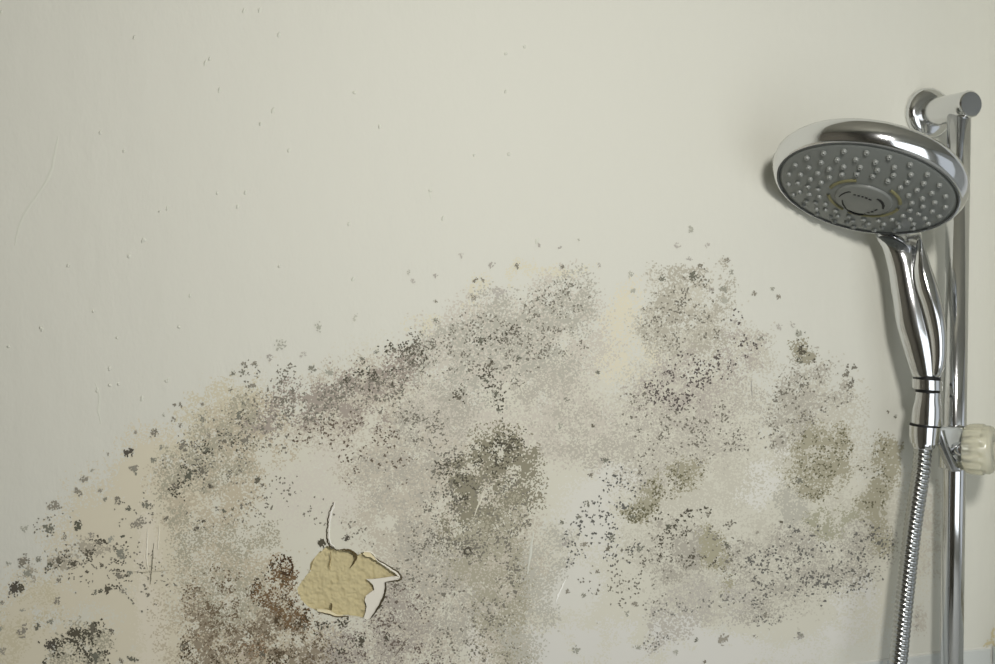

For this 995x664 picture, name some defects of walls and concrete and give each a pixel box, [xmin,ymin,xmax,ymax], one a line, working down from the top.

spalling [297,502,400,620]
leakage [0,243,912,664]